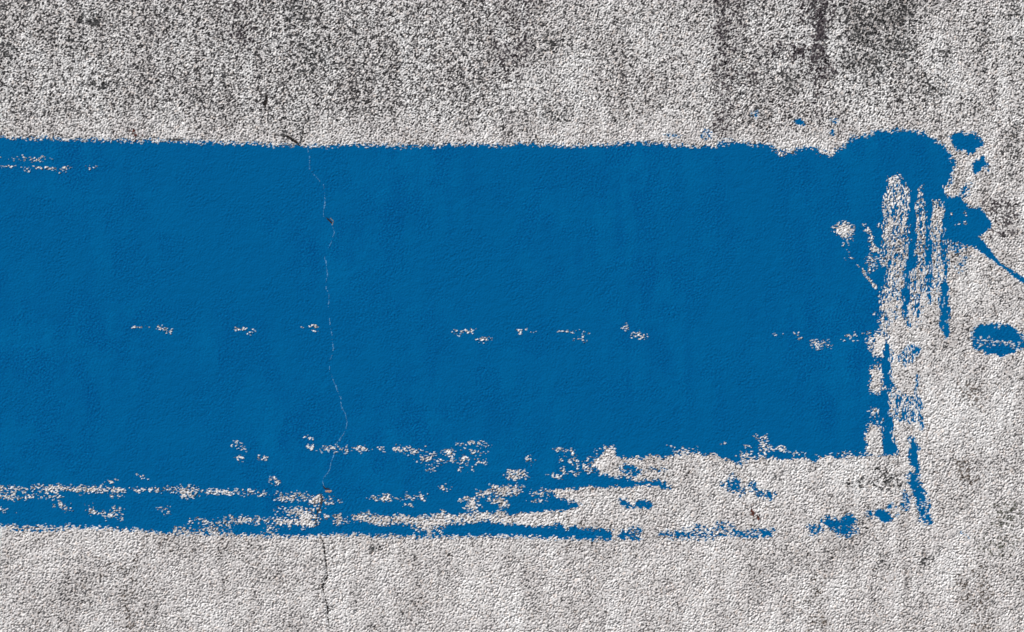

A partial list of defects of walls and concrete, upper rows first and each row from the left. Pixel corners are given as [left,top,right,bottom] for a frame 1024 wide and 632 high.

crack [261,86,348,631]
peeling [0,173,967,542]